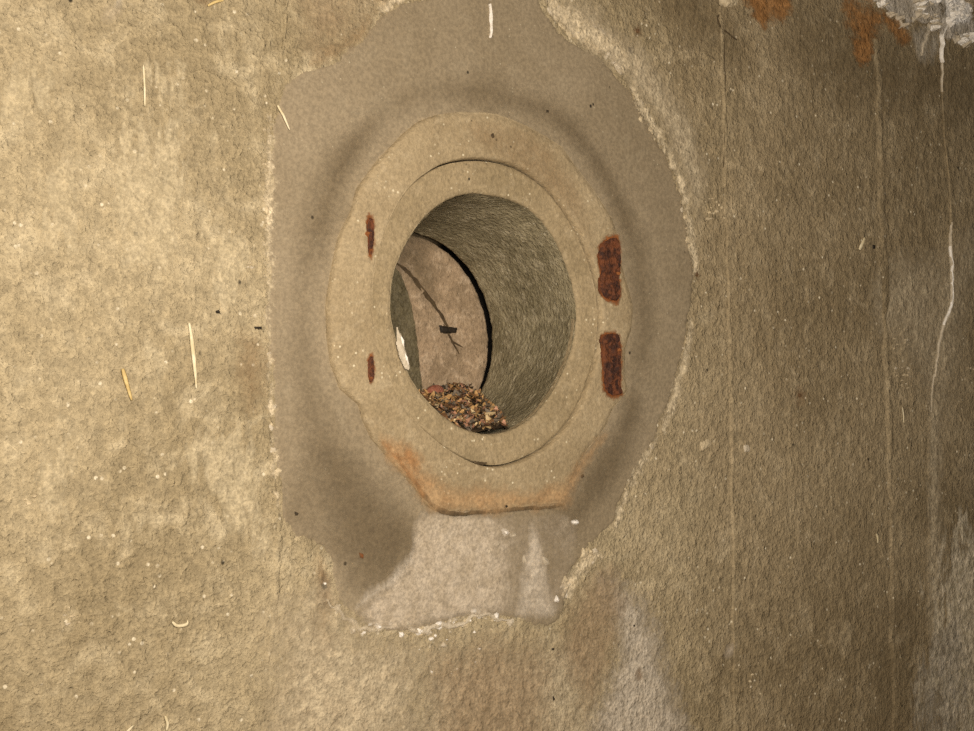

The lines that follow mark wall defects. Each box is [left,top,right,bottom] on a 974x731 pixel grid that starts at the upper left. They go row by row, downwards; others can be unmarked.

rust [844,0,910,62]
leakage [874,0,974,92]
rust [365,215,374,258]
rust [597,235,621,305]
rust [367,354,375,383]
rust [599,332,623,399]
leakage [364,516,567,648]